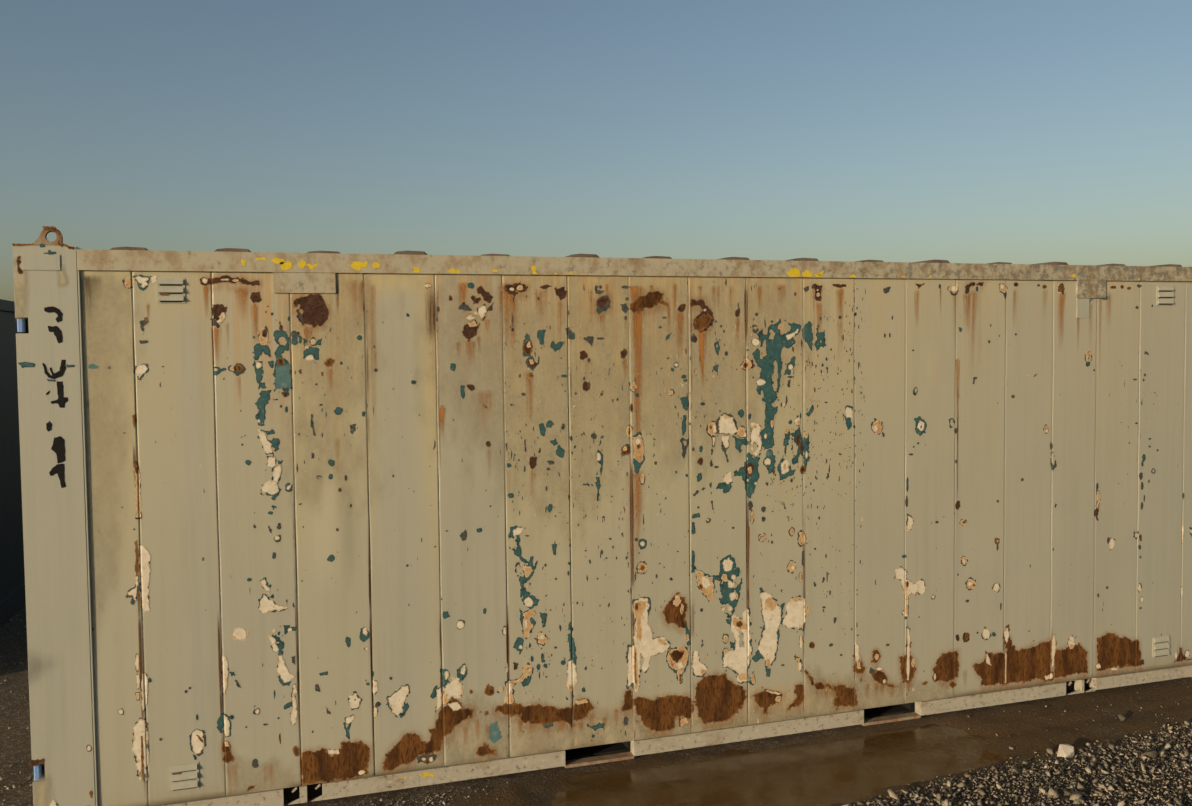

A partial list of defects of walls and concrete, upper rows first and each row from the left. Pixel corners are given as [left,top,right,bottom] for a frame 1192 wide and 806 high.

peeling [213,322,322,510]
rust [293,293,338,340]
rust [596,285,714,425]
peeling [668,319,826,542]
peeling [125,544,151,612]
peeling [131,653,152,783]
rust [292,674,594,785]
peeling [497,525,548,705]
peeling [625,597,708,692]
rust [621,670,858,732]
peeling [691,527,809,685]
rust [852,624,1144,689]